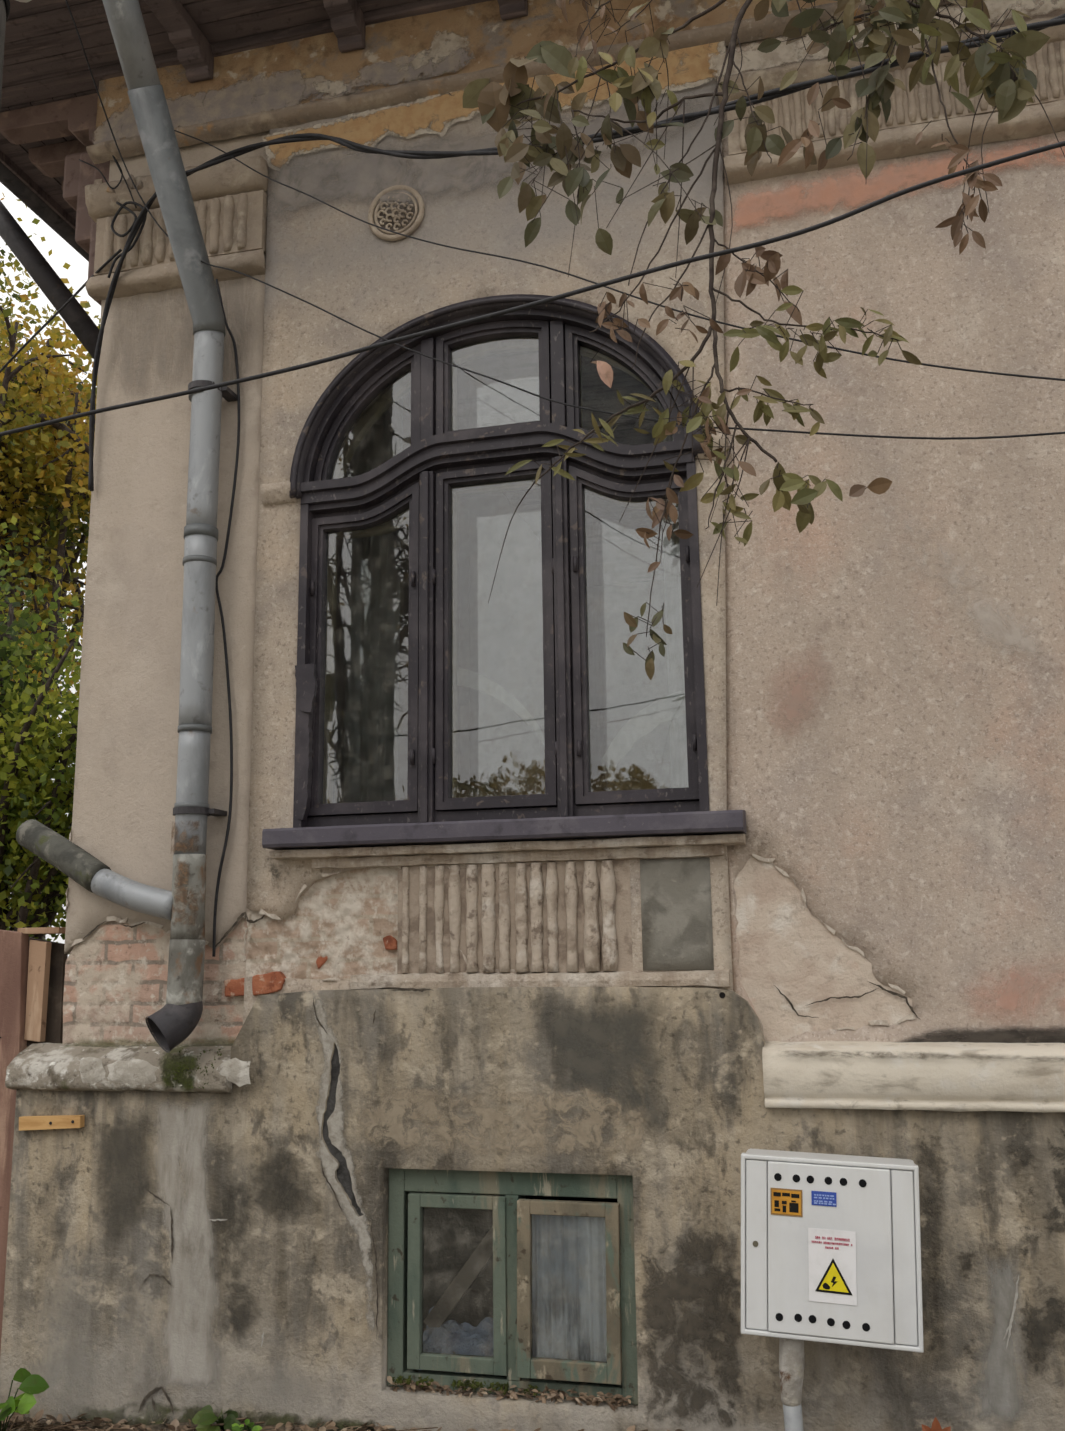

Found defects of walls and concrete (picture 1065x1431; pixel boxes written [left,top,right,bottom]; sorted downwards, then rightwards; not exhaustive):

peeling [527,30,833,110]
flaking render [63,916,171,1088]
rust [171,821,199,925]
flaking render [179,866,401,1087]
crack [373,988,431,1023]
flaking render [733,853,916,1041]
crack [774,982,921,1020]
leakage [99,1104,308,1386]
crack [313,999,378,1339]
leakage [637,1231,740,1427]
leakage [963,1266,1065,1418]
leakage [1044,1131,1065,1232]